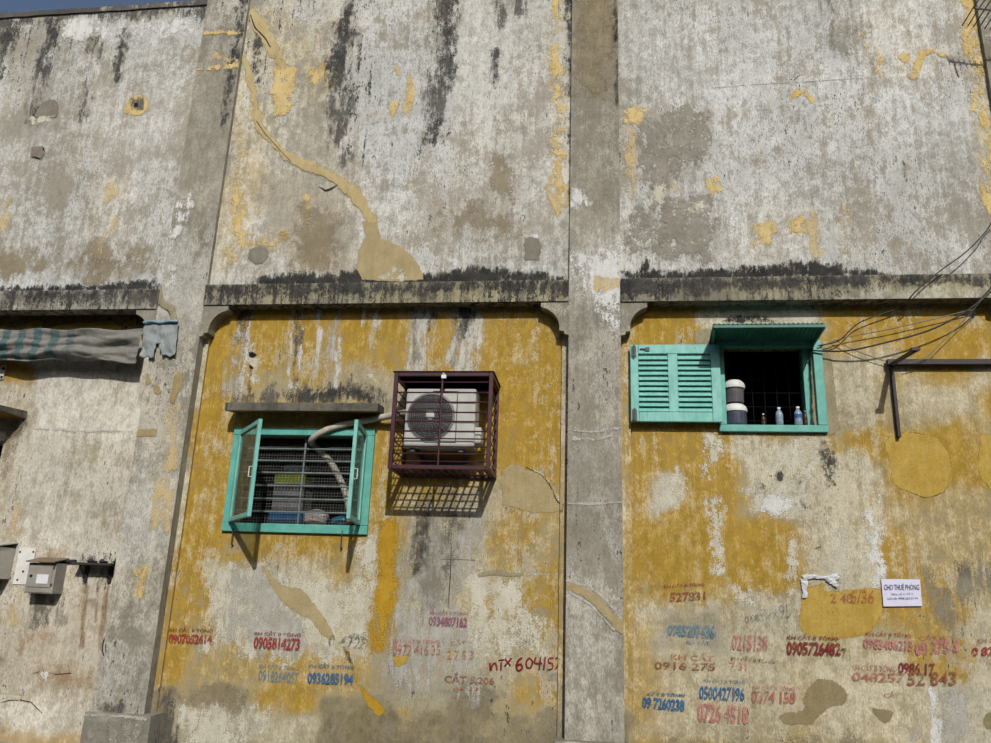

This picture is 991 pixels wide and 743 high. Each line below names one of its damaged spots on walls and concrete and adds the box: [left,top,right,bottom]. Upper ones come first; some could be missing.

leakage [0,2,207,124]
spalling [124,95,149,115]
peeling [307,61,330,89]
leakage [323,0,361,167]
peeling [389,66,415,120]
leakage [422,0,460,145]
peeling [224,120,290,264]
leakage [0,236,161,307]
leakage [205,201,569,298]
leakage [621,201,988,298]
leakage [221,309,387,407]
peeling [197,505,555,706]